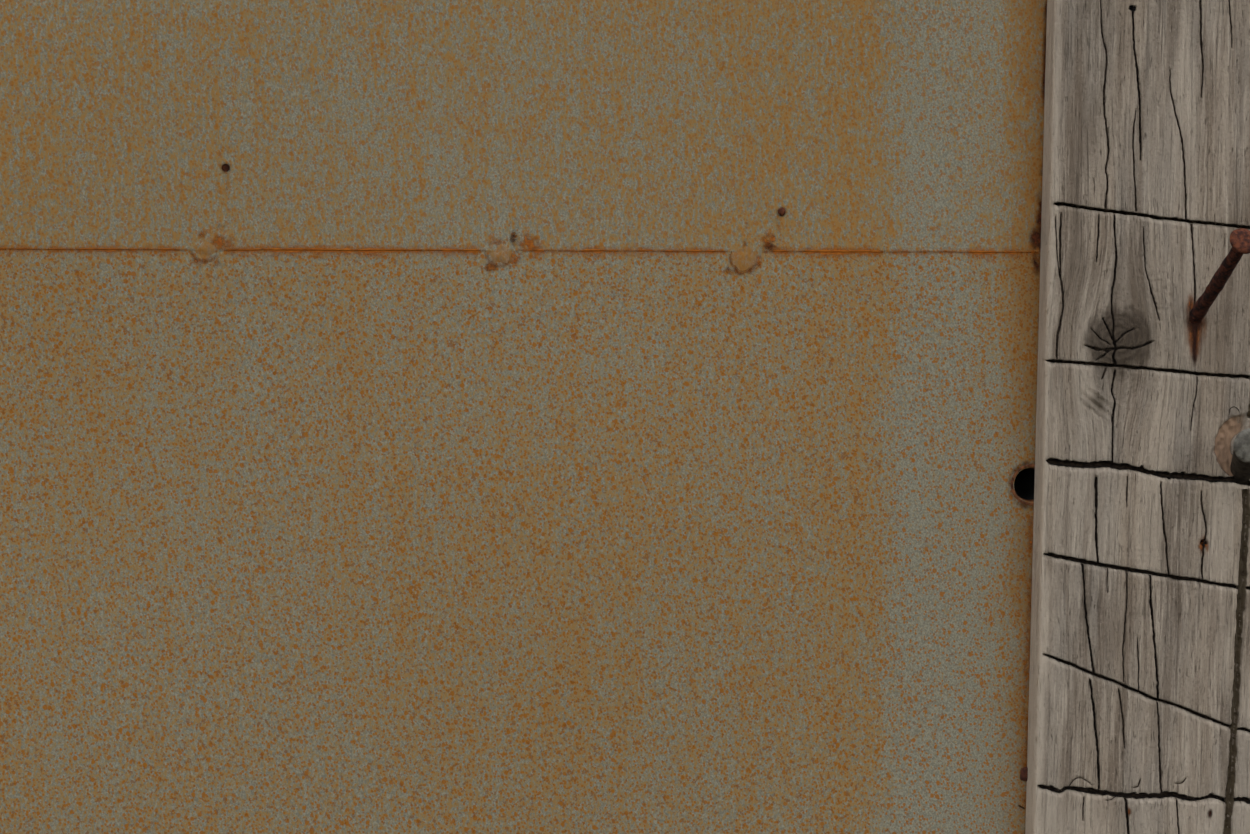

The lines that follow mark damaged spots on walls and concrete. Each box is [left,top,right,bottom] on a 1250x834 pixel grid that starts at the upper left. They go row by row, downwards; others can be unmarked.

corrosion [226,246,480,255]
corrosion [771,248,882,256]
corrosion [941,201,1042,271]
corrosion [1188,297,1205,362]
crack [1055,0,1232,834]
corrosion [1020,725,1028,781]